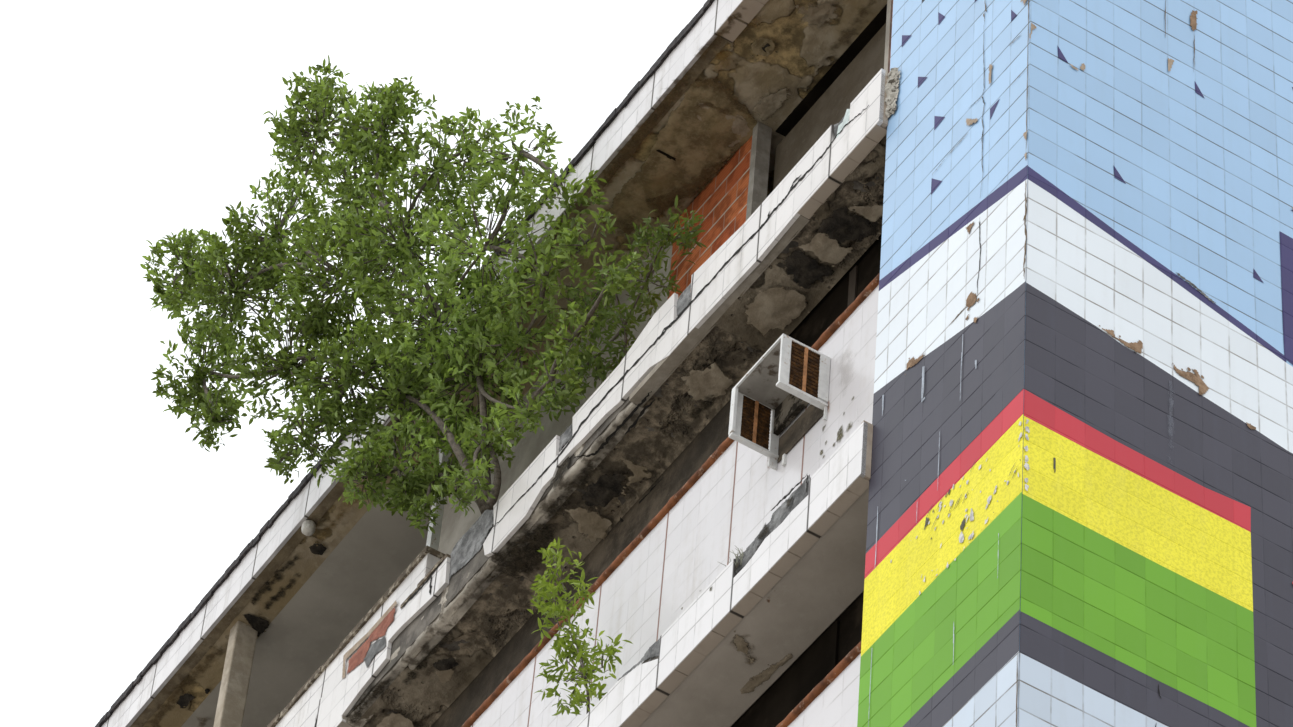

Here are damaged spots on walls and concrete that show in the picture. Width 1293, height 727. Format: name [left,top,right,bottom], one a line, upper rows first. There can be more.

crack [1165,6,1195,58]
peeling [1190,10,1198,31]
leakage [599,13,758,185]
leakage [646,149,735,221]
crack [949,4,987,325]
peeling [1099,325,1143,354]
peeling [1172,362,1209,395]
leakage [489,457,598,582]
peeling [735,475,810,574]
peeling [916,419,1030,595]
flaking render [342,600,397,679]
leakage [347,636,450,724]